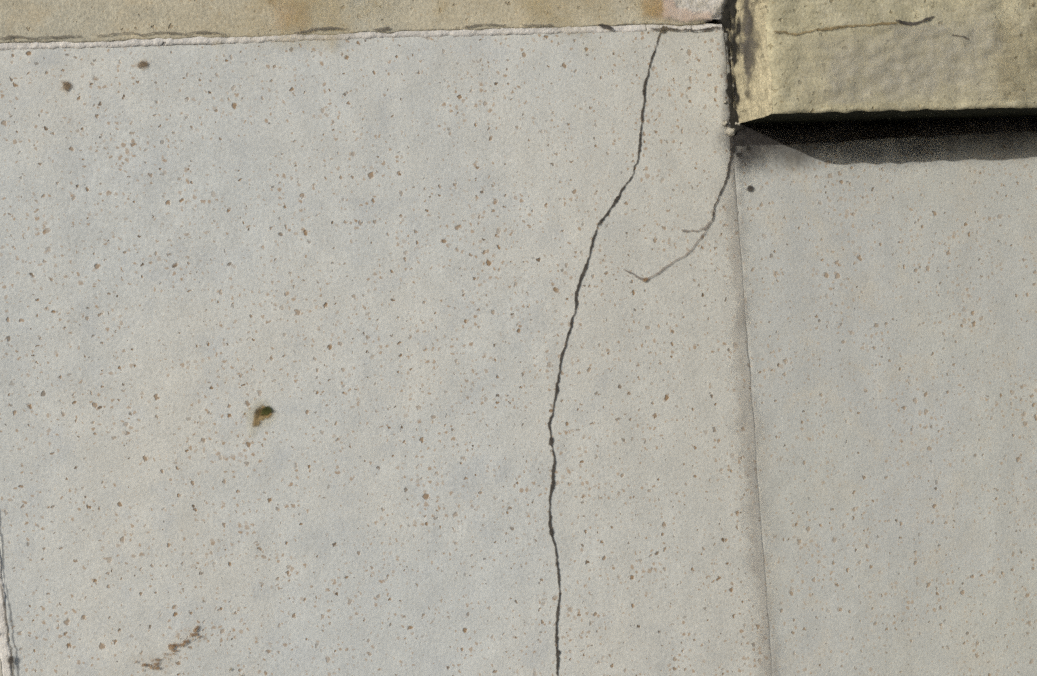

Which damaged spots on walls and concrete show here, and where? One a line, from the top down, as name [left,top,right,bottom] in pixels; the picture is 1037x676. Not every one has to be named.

crack [294,26,343,34]
crack [464,22,553,30]
crack [0,31,222,39]
crack [548,25,733,676]